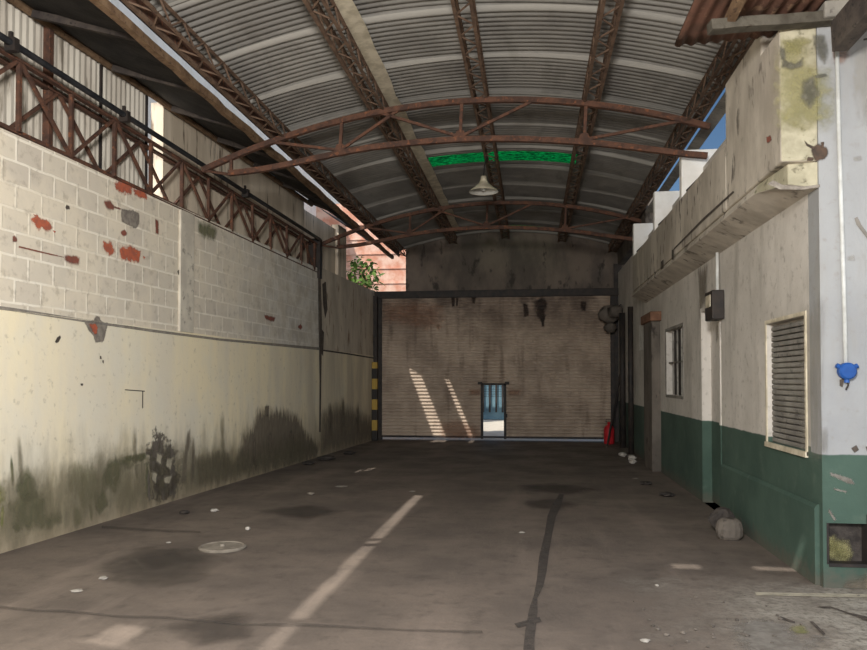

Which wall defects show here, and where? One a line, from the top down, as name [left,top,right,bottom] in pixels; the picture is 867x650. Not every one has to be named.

leakage [780,48,803,69]
leakage [815,36,827,59]
leakage [801,74,827,107]
peeling [31,215,56,233]
peeling [103,241,145,263]
spalling [85,316,107,342]
leakage [182,402,372,483]